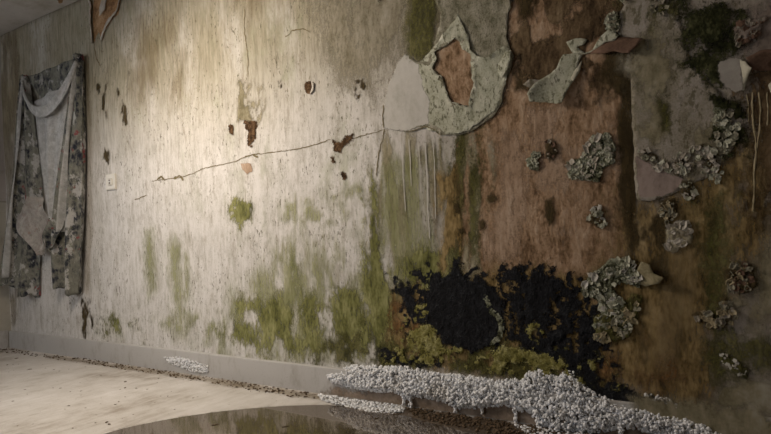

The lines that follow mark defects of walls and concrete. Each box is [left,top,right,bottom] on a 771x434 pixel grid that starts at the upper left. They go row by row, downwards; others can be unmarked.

flaking render [88,0,121,66]
crack [135,139,331,200]
peeling [228,81,263,147]
flaking render [330,133,355,164]
crack [356,105,385,176]
flaking render [383,0,771,344]
leakage [317,0,771,434]
leakage [163,356,209,373]